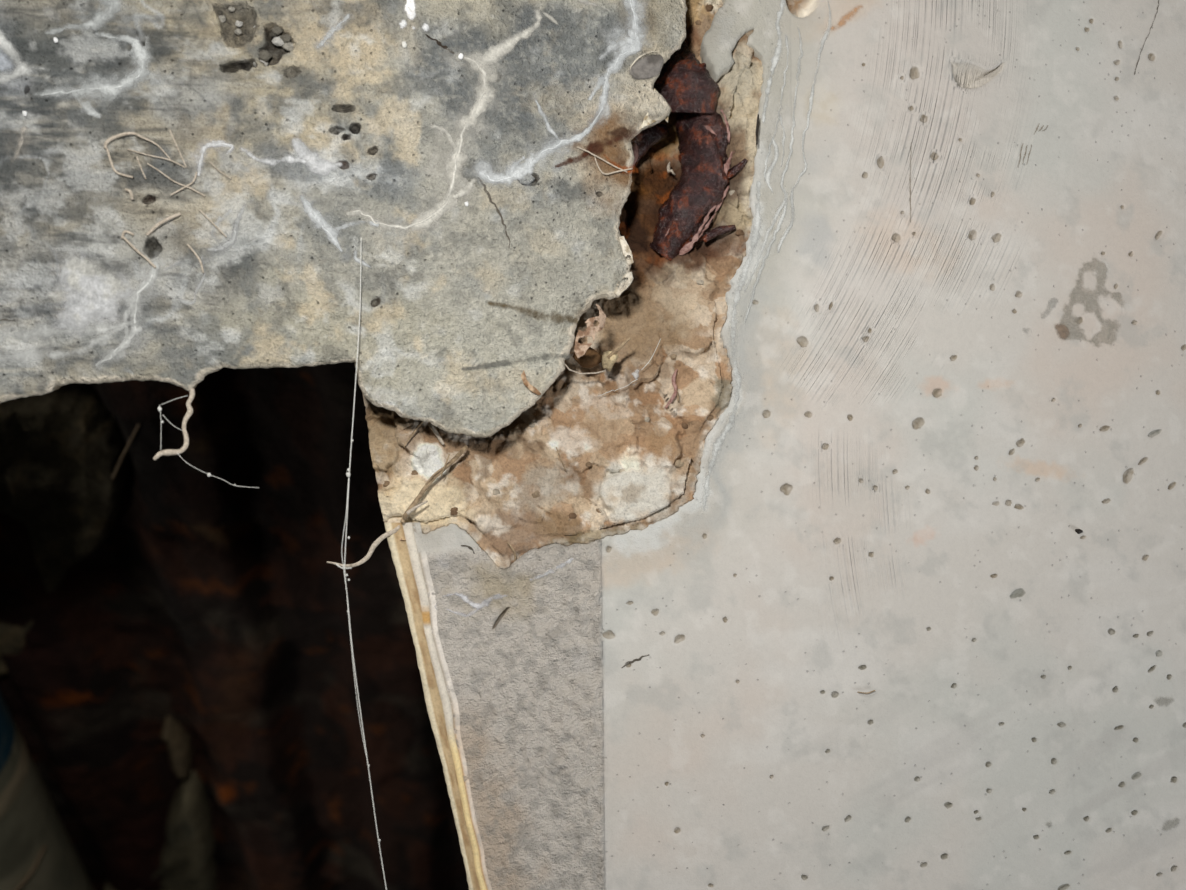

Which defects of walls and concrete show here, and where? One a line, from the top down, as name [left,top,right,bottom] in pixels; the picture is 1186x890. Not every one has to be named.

spalling [686,0,723,63]
corrosion [555,37,748,261]
spalling [362,29,763,570]
leakage [1044,259,1121,346]